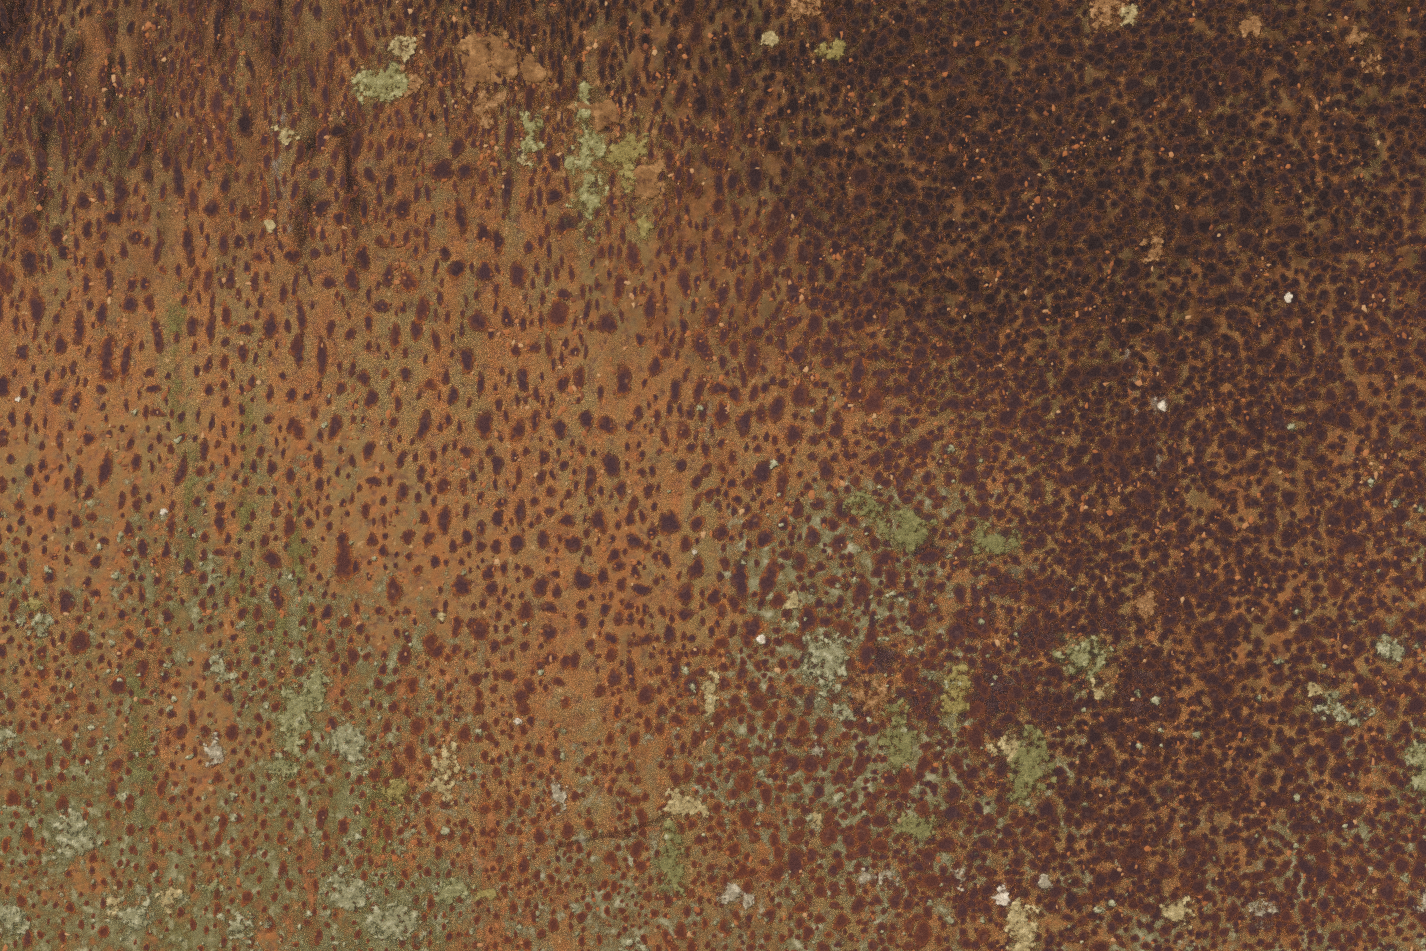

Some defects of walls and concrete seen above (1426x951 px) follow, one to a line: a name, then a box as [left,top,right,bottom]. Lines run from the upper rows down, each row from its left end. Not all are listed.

corrosion [76,127,184,270]
corrosion [202,0,255,222]
corrosion [283,123,412,264]
corrosion [439,167,513,282]
corrosion [449,27,668,235]
corrosion [98,333,132,386]
corrosion [288,297,328,378]
corrosion [530,409,620,495]
corrosion [491,509,644,642]
corrosion [658,510,728,541]
corrosion [674,424,803,647]
corrosion [599,602,681,718]